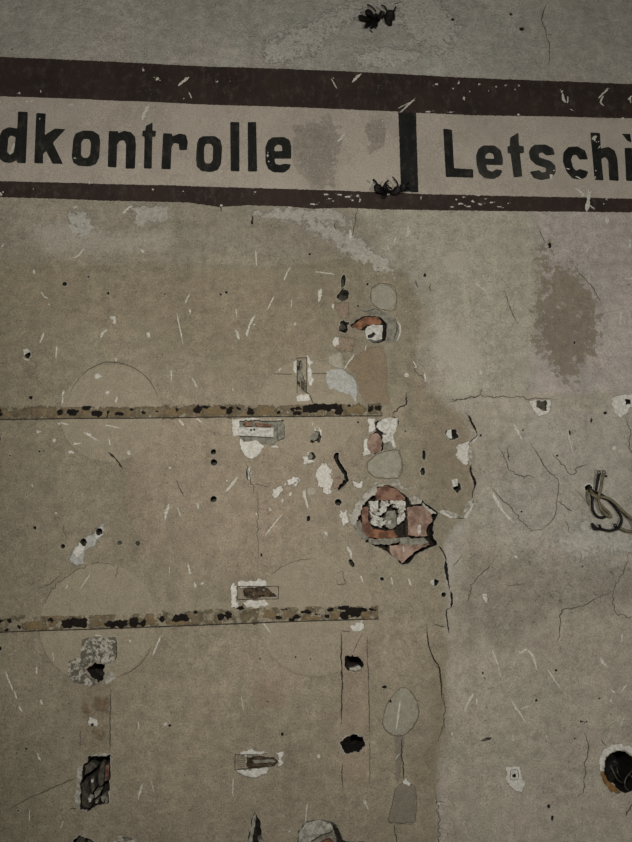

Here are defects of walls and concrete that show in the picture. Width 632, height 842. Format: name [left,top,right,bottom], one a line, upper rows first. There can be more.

spalling [332,300,401,344]
water stain [523,230,610,395]
rust [0,401,384,423]
crack [452,390,557,402]
spalling [230,418,285,480]
spalling [299,452,335,496]
crack [492,441,588,536]
spalling [338,414,482,633]
rust [0,602,382,635]
crack [557,547,632,644]
spalling [67,637,117,687]
crack [340,631,444,842]